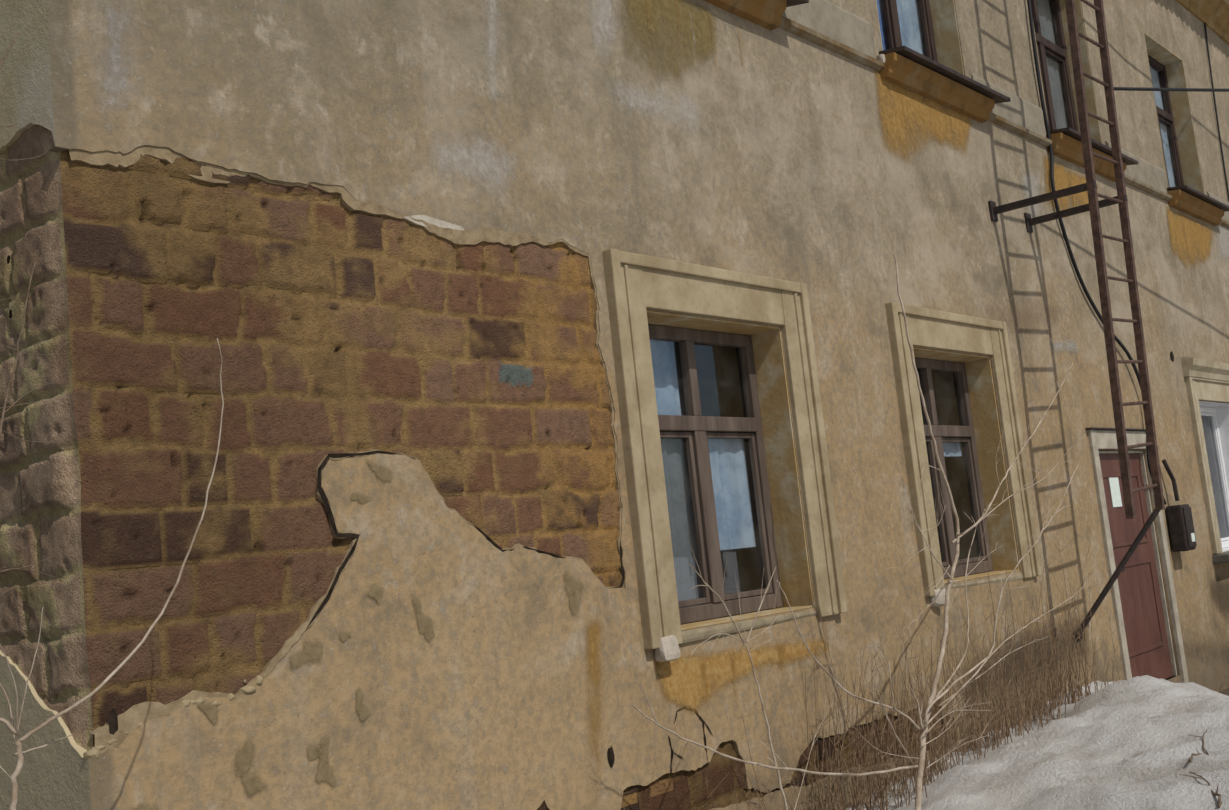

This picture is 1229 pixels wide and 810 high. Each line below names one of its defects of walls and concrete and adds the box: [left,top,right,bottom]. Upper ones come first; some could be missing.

flaking render [0,125,625,760]
flaking render [621,700,946,810]